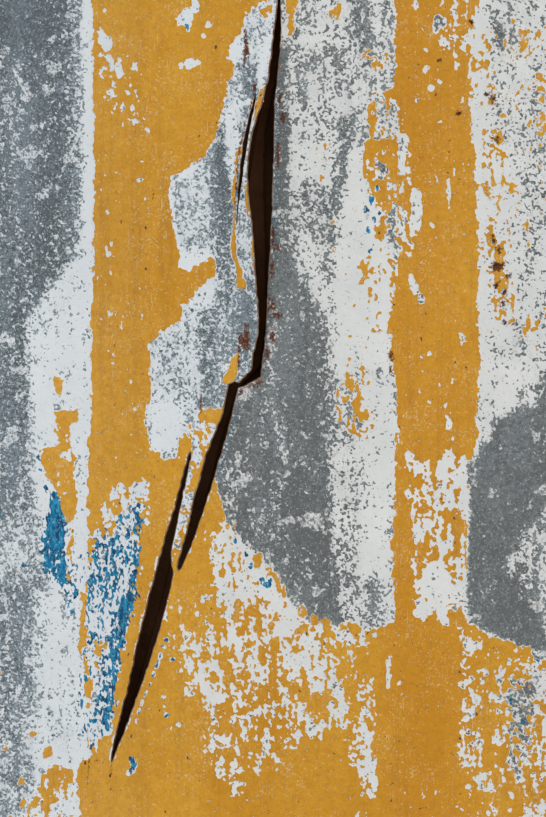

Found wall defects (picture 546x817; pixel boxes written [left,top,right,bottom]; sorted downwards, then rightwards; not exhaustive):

peeling [0,0,150,817]
crack [236,92,263,224]
peeling [138,0,546,817]